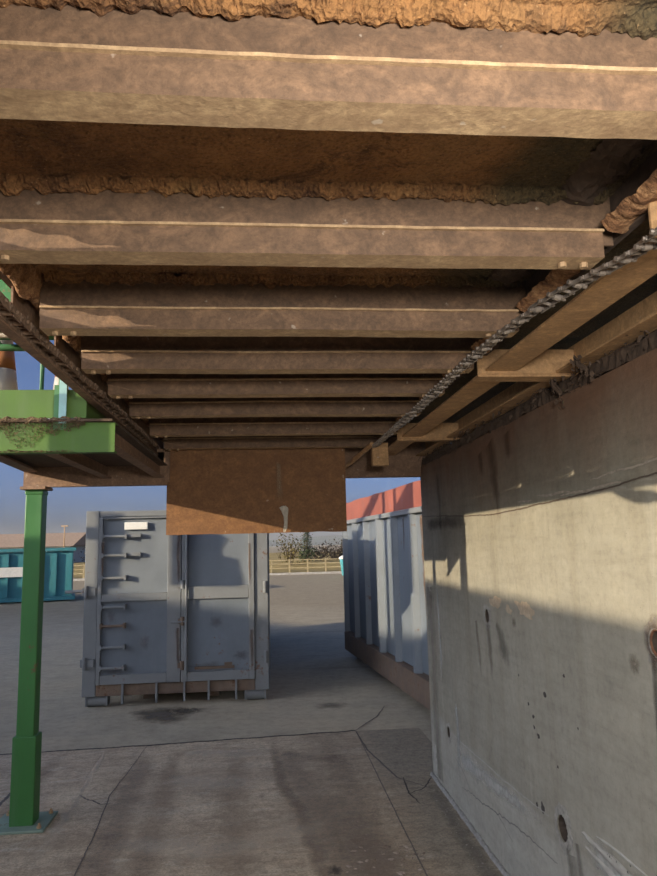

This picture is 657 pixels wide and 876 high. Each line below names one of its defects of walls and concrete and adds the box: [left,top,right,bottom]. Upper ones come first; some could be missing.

crack [403,776,432,803]
crack [465,789,557,863]